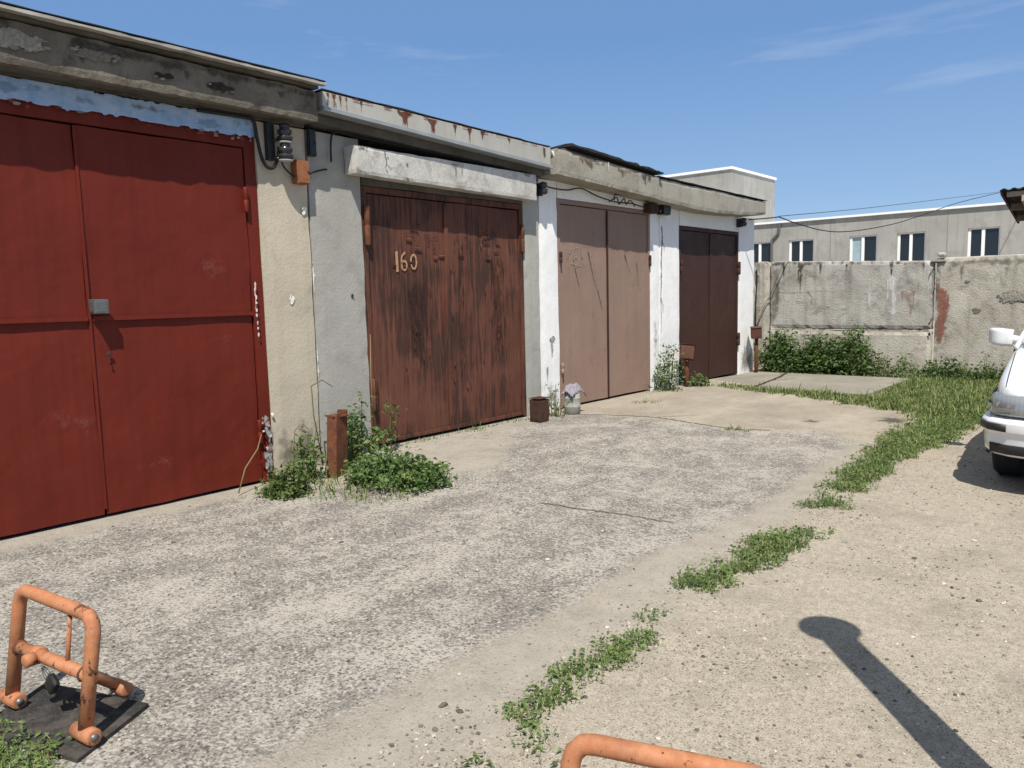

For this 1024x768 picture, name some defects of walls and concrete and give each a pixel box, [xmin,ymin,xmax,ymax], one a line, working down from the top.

spalling [0,27,51,52]
spalling [70,46,128,63]
peeling [0,75,255,142]
corrosion [326,93,437,133]
leakage [772,260,861,317]
leakage [886,261,900,317]
crack [540,502,675,523]